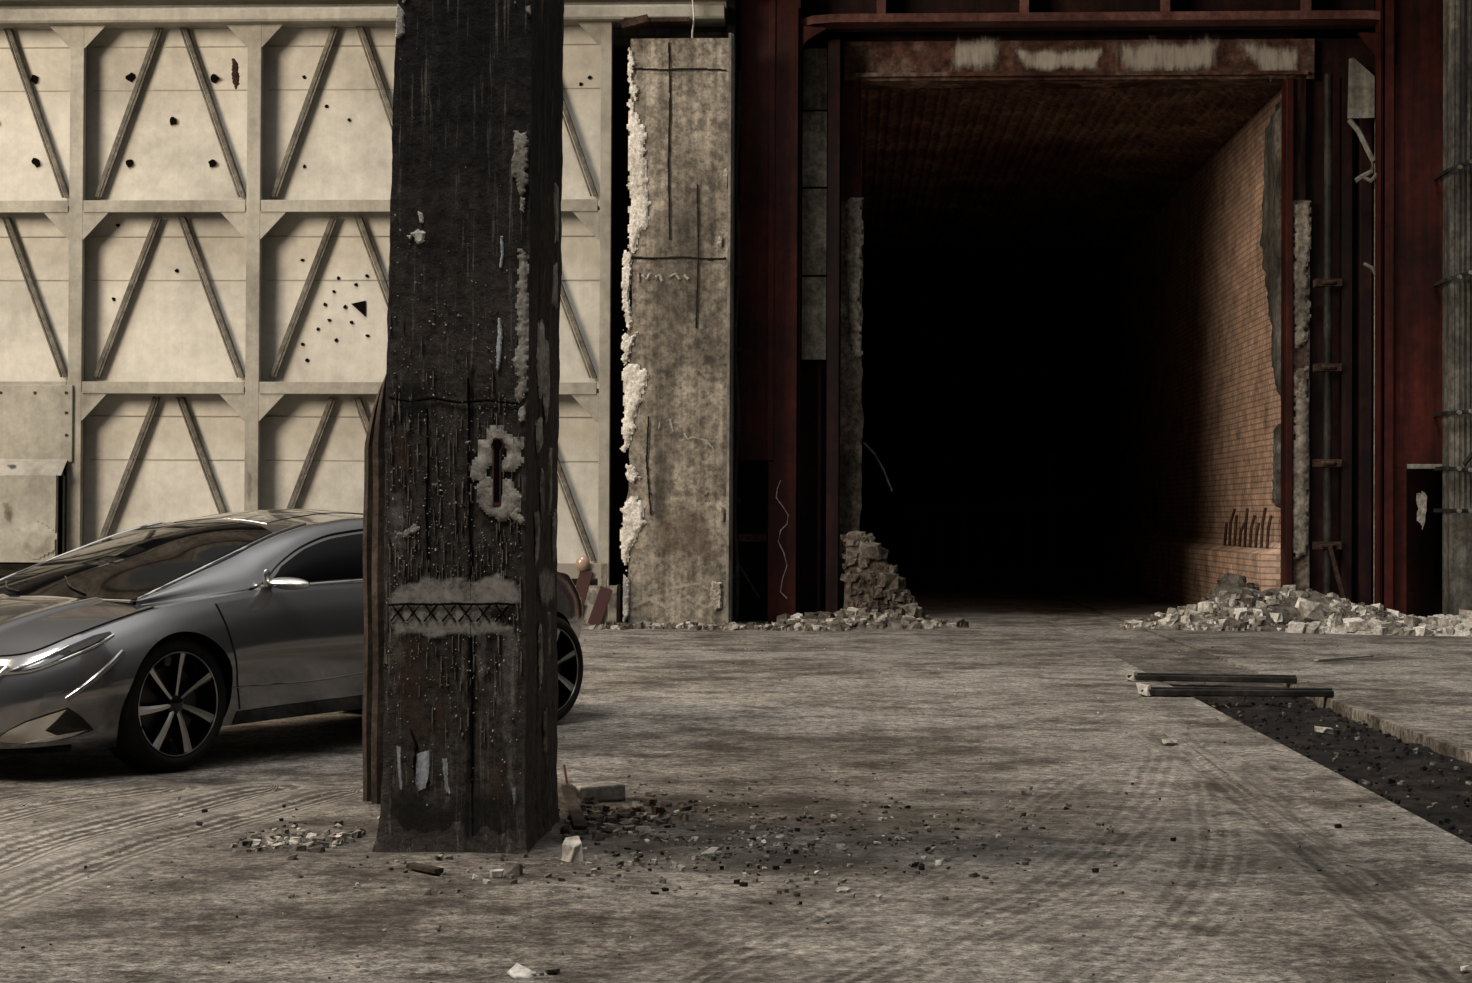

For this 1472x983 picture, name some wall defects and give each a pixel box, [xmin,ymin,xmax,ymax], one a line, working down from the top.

peeling [395,0,406,38]
peeling [955,39,996,67]
peeling [1018,50,1101,70]
peeling [1123,40,1215,71]
peeling [1245,44,1297,71]
spalling [620,47,722,623]
spalling [465,236,558,753]
peeling [395,524,420,538]
spalling [391,574,518,637]